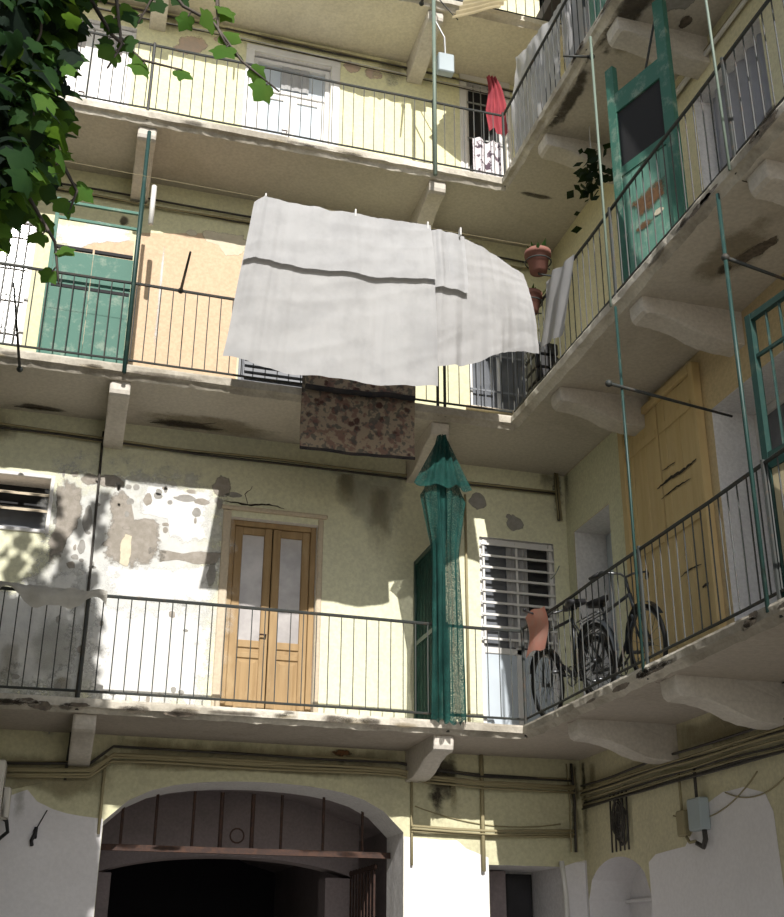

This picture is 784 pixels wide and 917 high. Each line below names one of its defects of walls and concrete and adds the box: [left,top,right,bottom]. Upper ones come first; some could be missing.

leakage [599,0,652,45]
leakage [549,58,589,127]
peeling [56,216,131,257]
peeling [186,230,246,256]
leakage [718,236,778,274]
crack [224,487,284,509]
peeling [0,466,256,717]
leakage [430,760,455,808]